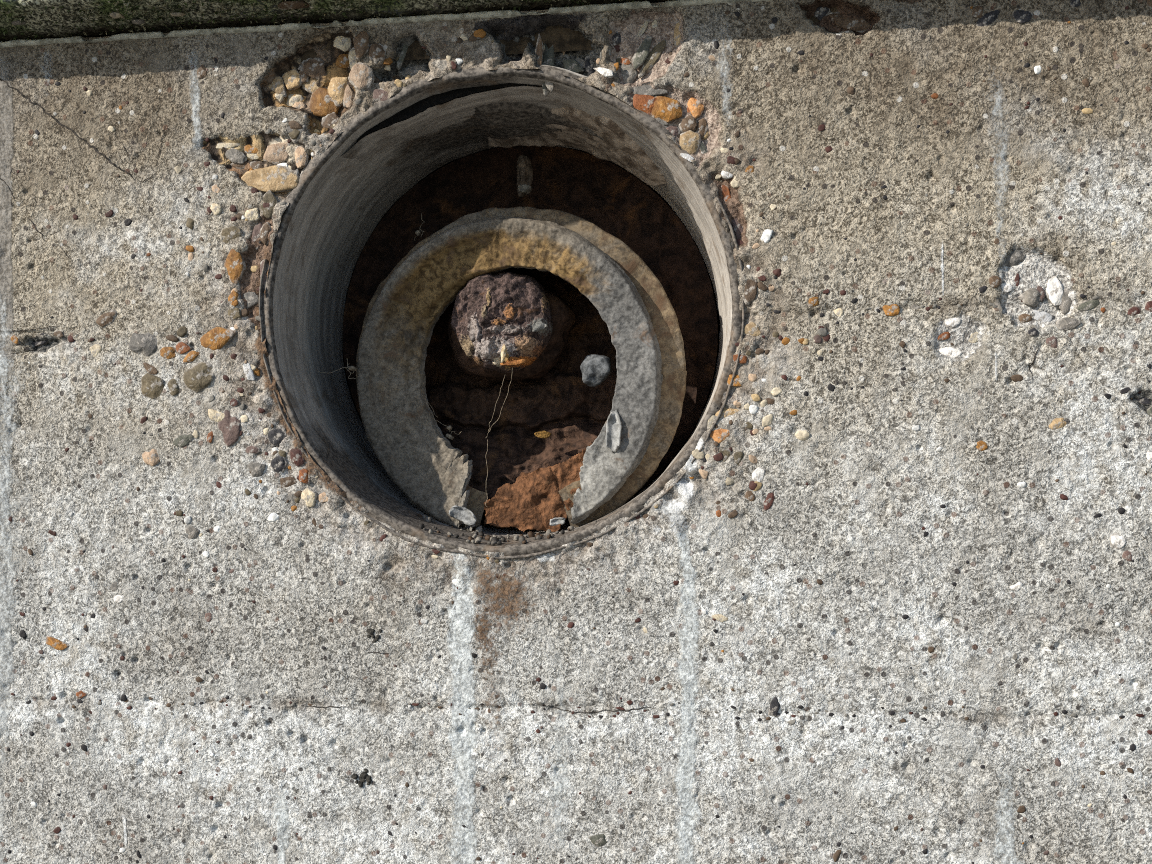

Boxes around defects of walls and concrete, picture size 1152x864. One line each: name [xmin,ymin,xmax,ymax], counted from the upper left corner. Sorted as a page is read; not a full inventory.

crack [0,78,165,182]
spalling [200,31,431,198]
spalling [494,10,722,168]
spalling [711,173,747,247]
corrosion [424,267,617,500]
leakage [447,554,477,864]
corrosion [474,567,529,673]
leakage [653,439,703,864]